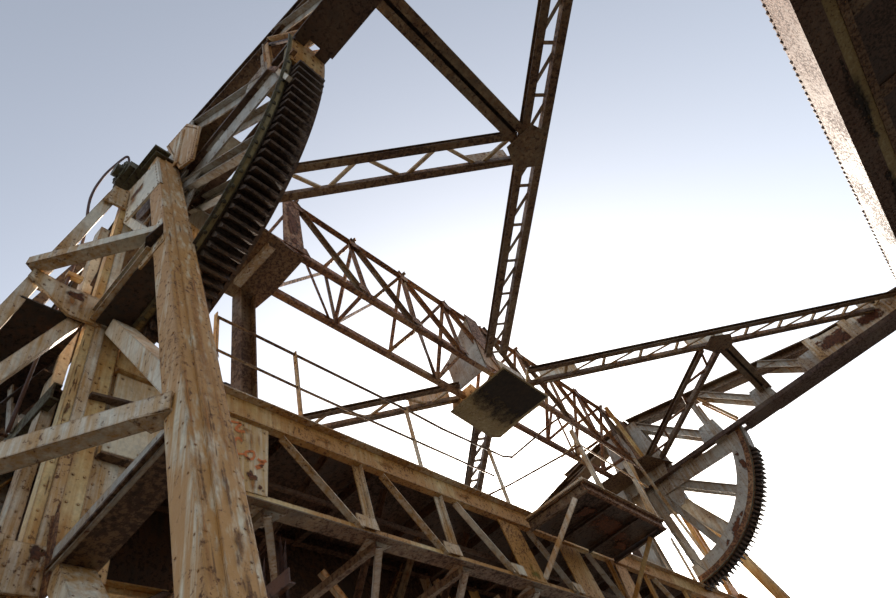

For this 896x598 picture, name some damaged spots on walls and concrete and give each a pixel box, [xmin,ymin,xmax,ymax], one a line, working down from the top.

corrosion [286,203,298,244]
corrosion [855,308,884,326]
corrosion [815,327,851,352]
corrosion [246,457,264,489]
corrosion [726,511,743,546]